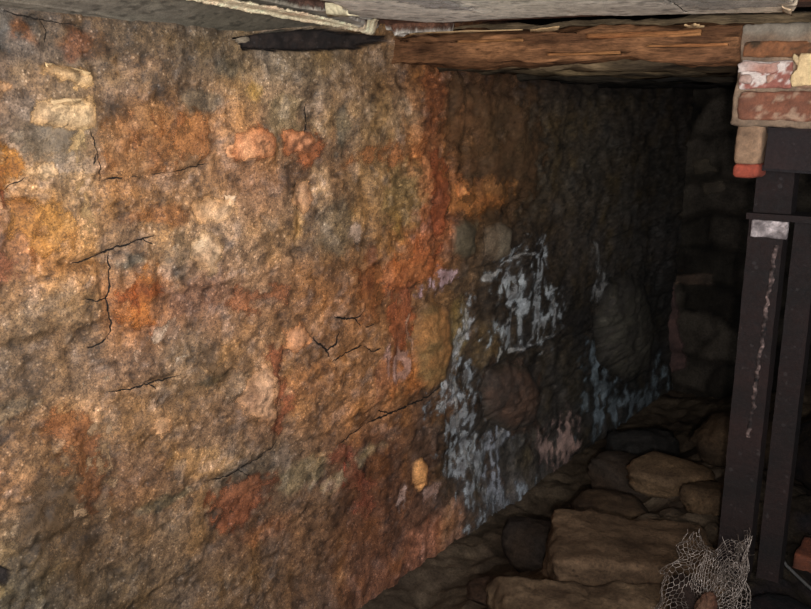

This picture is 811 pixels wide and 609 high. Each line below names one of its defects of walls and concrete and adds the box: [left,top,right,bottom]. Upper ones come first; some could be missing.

spalling [187,0,602,52]
spalling [782,0,811,16]
corrosion [0,141,80,262]
corrosion [343,135,518,364]
crack [71,235,154,348]
crack [312,314,381,362]
crack [104,374,182,394]
crack [339,383,443,444]
leakage [422,233,673,537]
corrosion [203,465,281,536]
leakage [395,484,407,511]